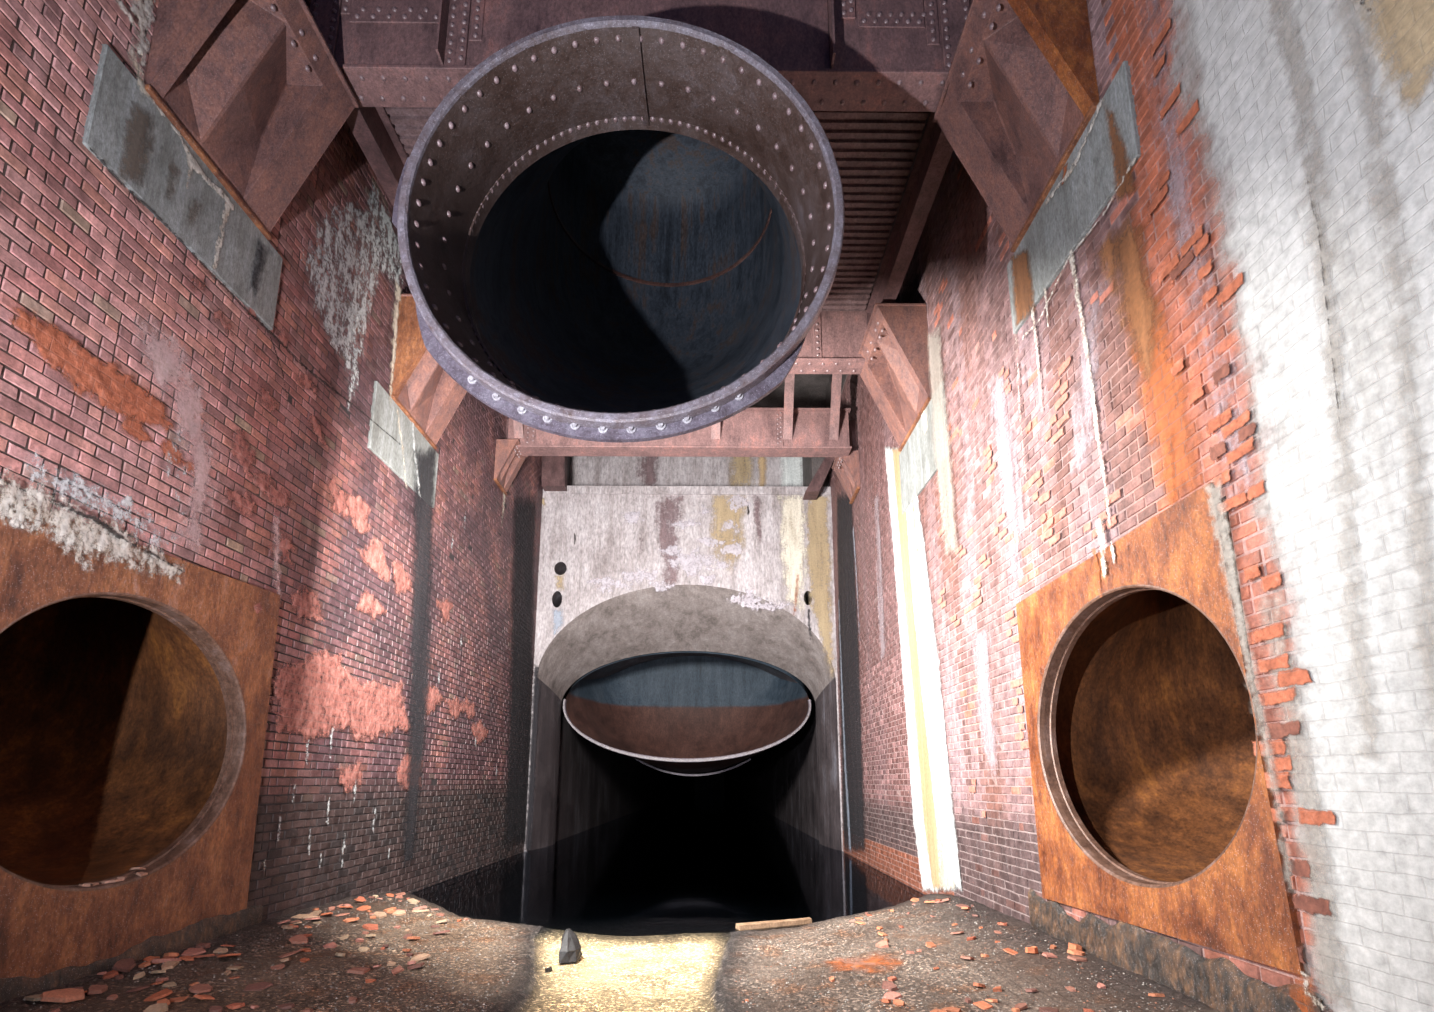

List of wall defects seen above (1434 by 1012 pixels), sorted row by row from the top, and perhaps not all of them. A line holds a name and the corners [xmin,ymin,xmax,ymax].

water stain [1045,98,1103,204]
water stain [301,185,403,408]
spalling [1157,224,1243,308]
water stain [1015,158,1136,590]
rust [1100,218,1196,506]
efflorescence [0,327,212,585]
spalling [1206,408,1265,513]
spalling [1252,622,1312,706]
spalling [1253,720,1300,789]
spalling [1298,808,1335,826]
spalling [1293,894,1332,916]
rust [1290,972,1324,1012]